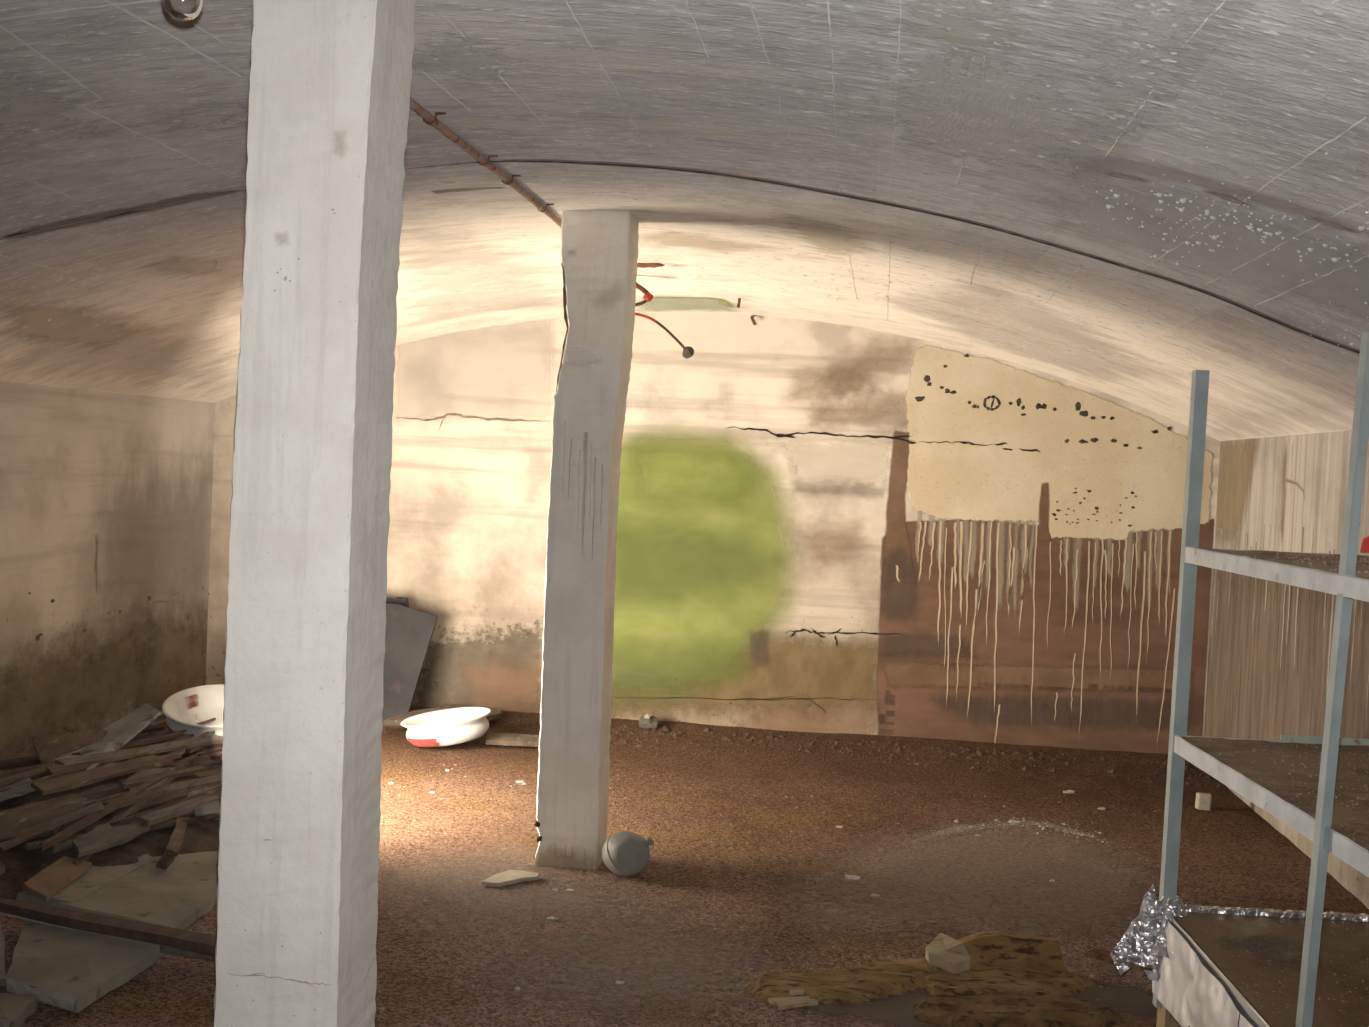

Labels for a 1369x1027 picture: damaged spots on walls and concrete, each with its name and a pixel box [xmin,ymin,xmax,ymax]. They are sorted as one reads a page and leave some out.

crack [396,413,537,431]
crack [729,427,1040,452]
damp [1199,440,1255,550]
damp [0,587,210,755]
damp [611,431,1182,754]
damp [1187,565,1369,740]